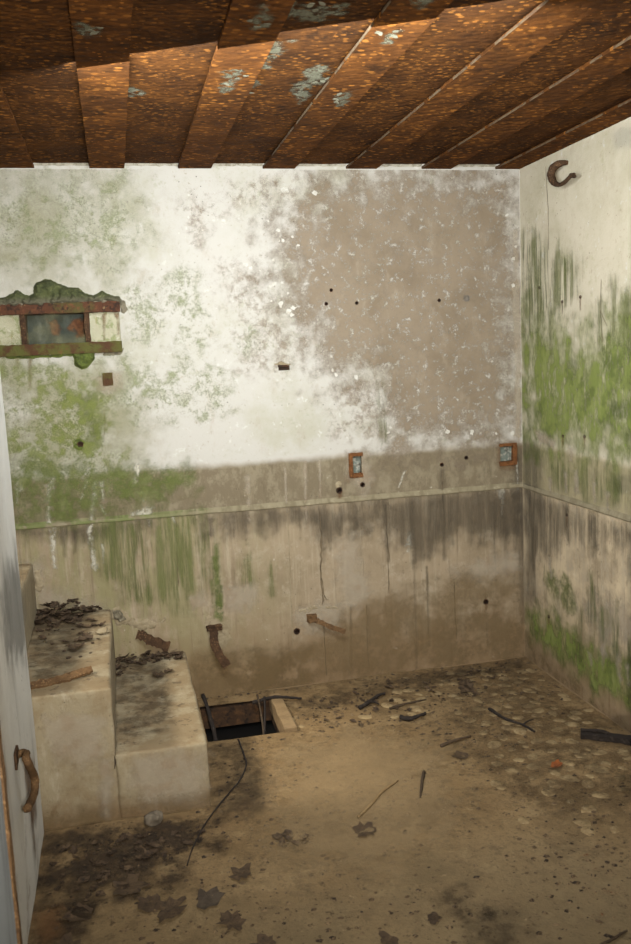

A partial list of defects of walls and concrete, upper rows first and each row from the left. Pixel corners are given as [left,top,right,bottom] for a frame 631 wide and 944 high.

spalling [0,279,128,314]
spalling [73,348,124,370]
water stain [79,473,106,571]
water stain [385,462,519,552]